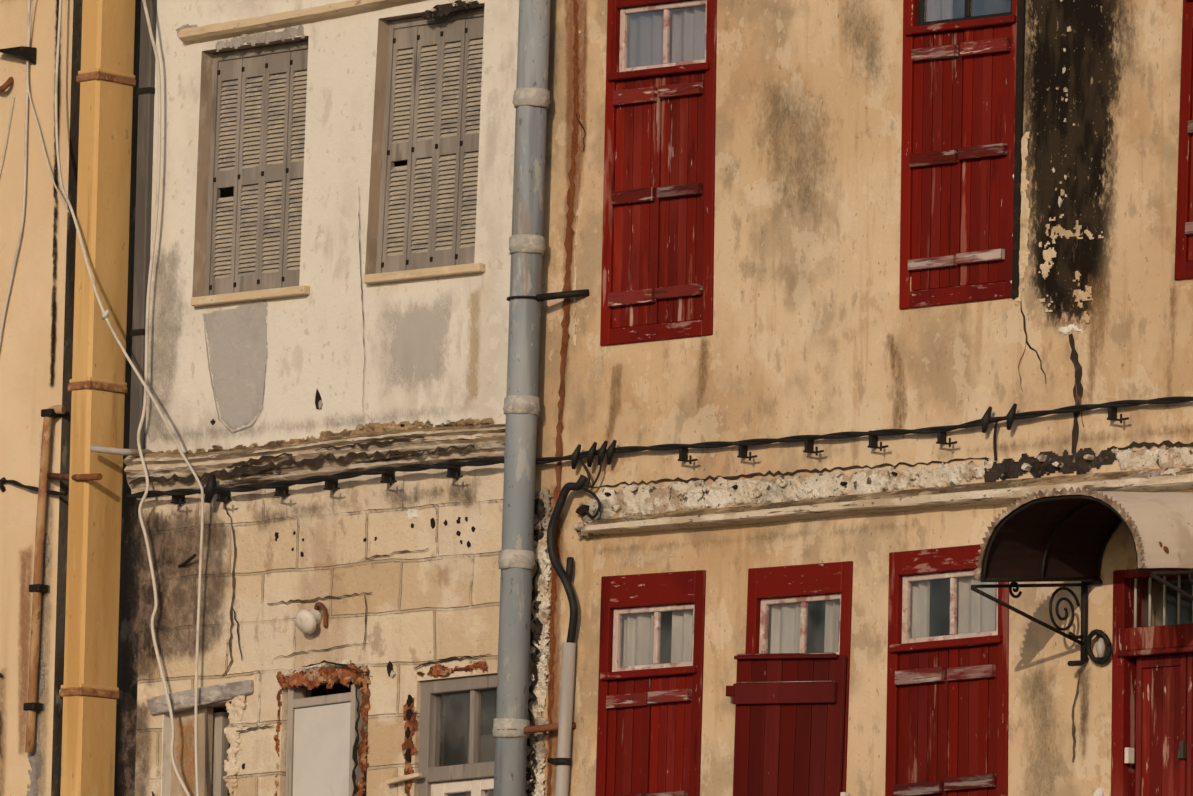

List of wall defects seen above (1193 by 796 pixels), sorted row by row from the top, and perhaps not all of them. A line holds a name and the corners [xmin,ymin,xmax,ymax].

water stain [1011,0,1130,389]
crack [1018,302,1084,454]
spalling [572,440,1193,541]
water stain [135,508,226,680]
spalling [223,695,247,796]